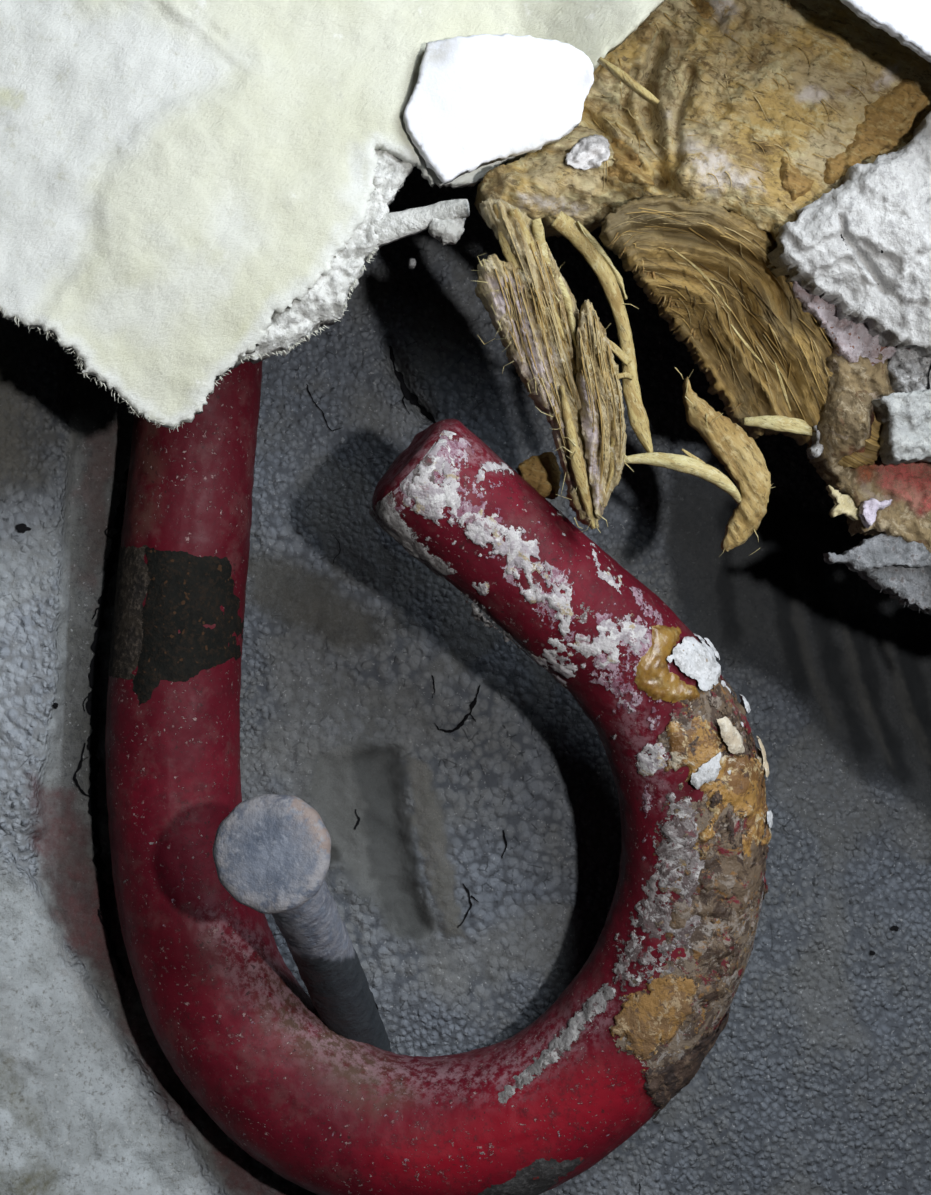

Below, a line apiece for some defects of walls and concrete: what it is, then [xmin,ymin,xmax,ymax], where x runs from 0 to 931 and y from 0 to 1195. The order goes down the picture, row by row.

flaking render [403,33,655,185]
peeling [779,79,929,202]
flaking render [823,534,931,616]
rust [610,678,771,1119]